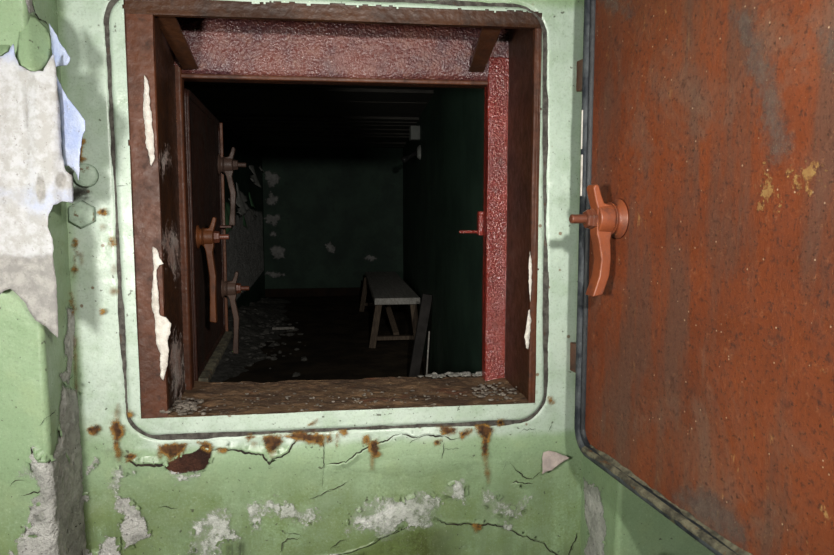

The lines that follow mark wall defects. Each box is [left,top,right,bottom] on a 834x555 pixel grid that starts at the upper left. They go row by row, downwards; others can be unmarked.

peeling [143,75,172,178]
peeling [0,0,151,555]
peeling [152,223,186,399]
corrosion [87,411,136,461]
crack [122,452,166,467]
corrosion [158,442,186,460]
flaking render [163,446,213,481]
crack [209,434,297,469]
corrosion [263,421,347,453]
crack [311,428,459,499]
corrosion [434,419,504,459]
crack [434,515,577,555]